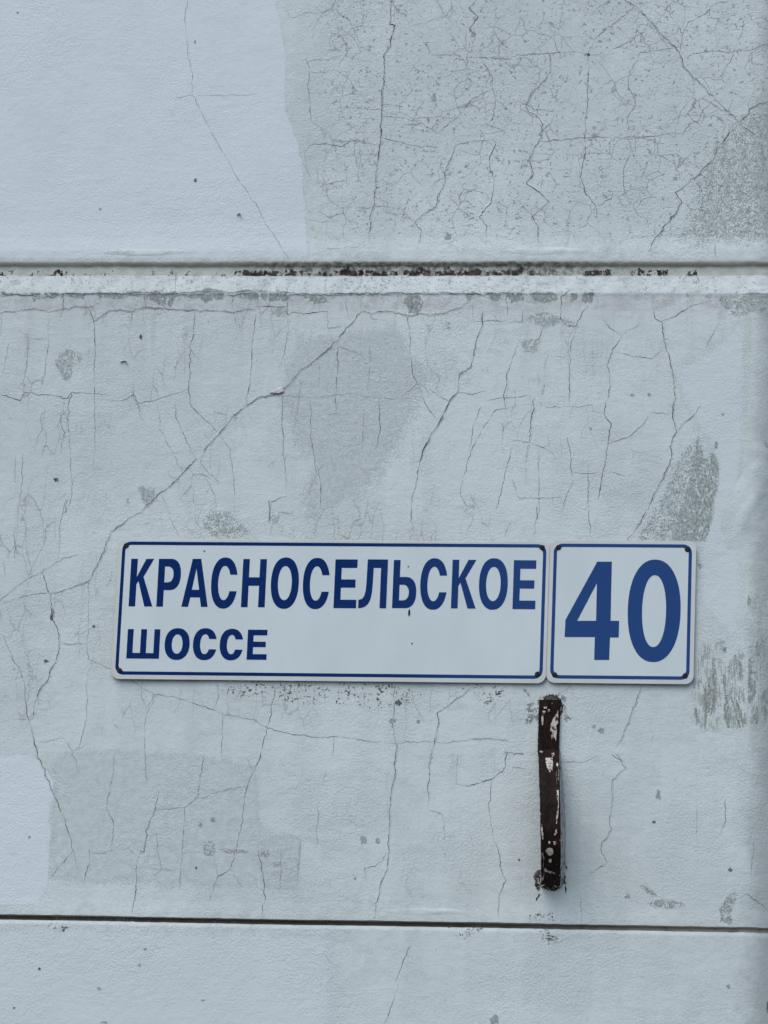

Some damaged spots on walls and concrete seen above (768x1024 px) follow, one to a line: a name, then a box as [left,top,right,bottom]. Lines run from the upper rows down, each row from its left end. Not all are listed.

crack [284,0,768,251]
crack [0,279,701,918]
peeling [635,434,721,542]